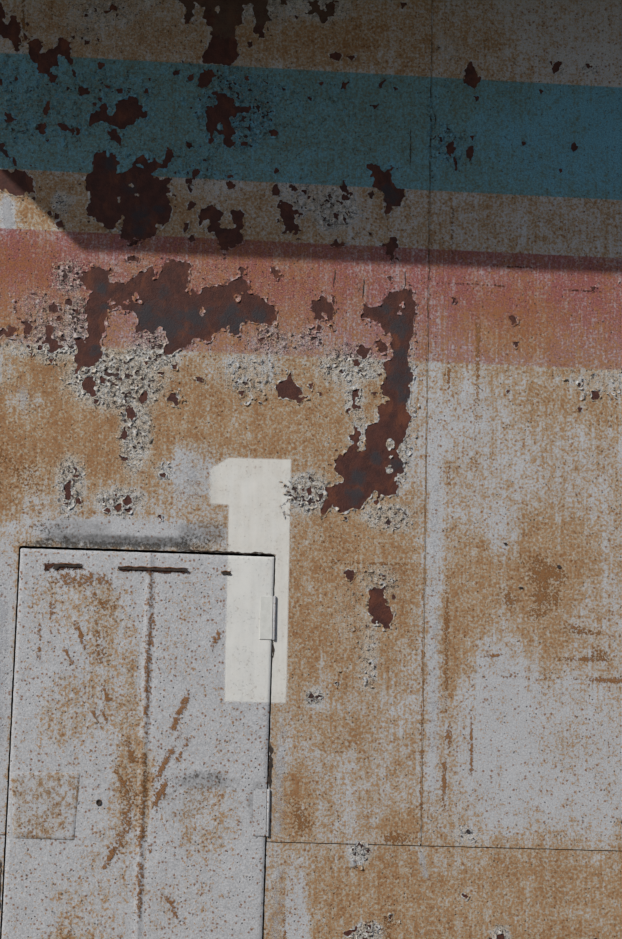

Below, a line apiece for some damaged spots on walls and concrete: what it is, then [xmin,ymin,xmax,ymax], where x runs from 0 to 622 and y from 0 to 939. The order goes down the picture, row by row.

peeling [0,0,341,407]
peeling [332,161,408,224]
peeling [366,230,400,263]
peeling [301,275,423,521]
peeling [343,568,397,631]
corrosion [518,554,567,618]
corrosion [554,647,609,662]
corrosion [589,676,622,684]
corrosion [112,567,190,918]
corrosion [441,726,452,811]